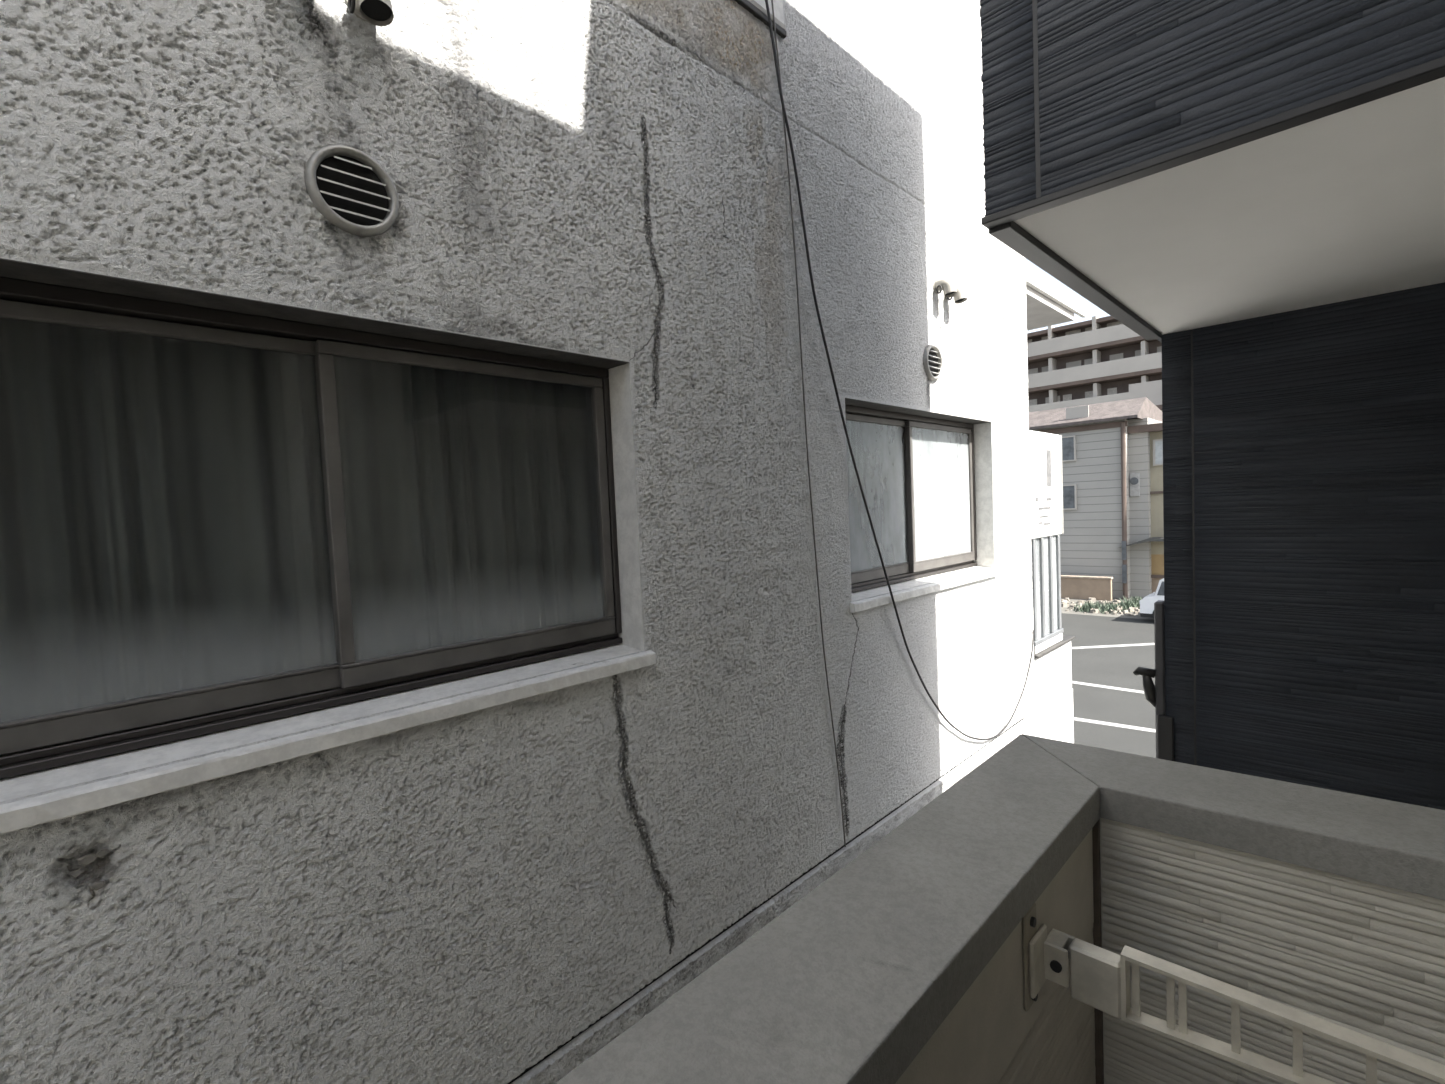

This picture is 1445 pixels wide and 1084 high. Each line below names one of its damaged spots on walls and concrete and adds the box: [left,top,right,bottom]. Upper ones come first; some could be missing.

crack [629,116,664,409]
crack [613,675,676,954]
crack [837,613,859,836]